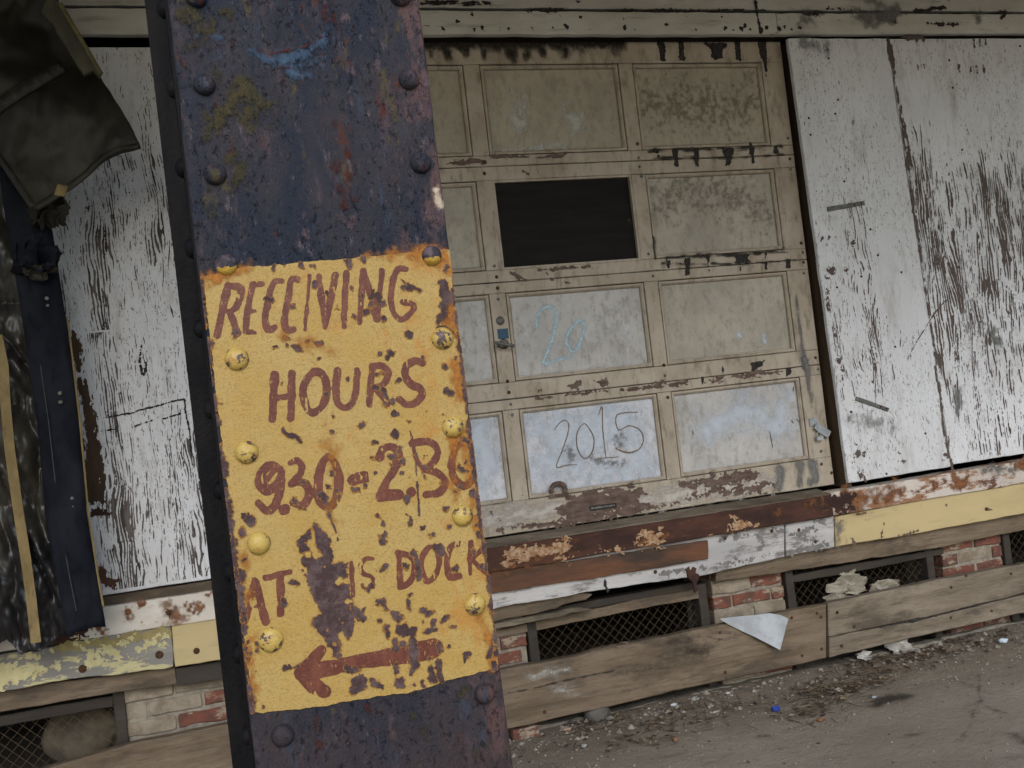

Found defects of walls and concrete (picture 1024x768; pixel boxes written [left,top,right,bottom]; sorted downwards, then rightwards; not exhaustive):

damp [424,42,626,63]
peeling [59,66,210,590]
corrosion [387,245,428,261]
peeling [825,195,914,427]
peeling [910,112,1024,460]
corrosion [450,360,463,401]
peeling [436,264,776,673]
peeling [288,348,472,696]
peeling [659,514,844,579]
corrosion [125,599,146,620]
corrosion [163,591,213,625]
peeling [0,625,172,692]